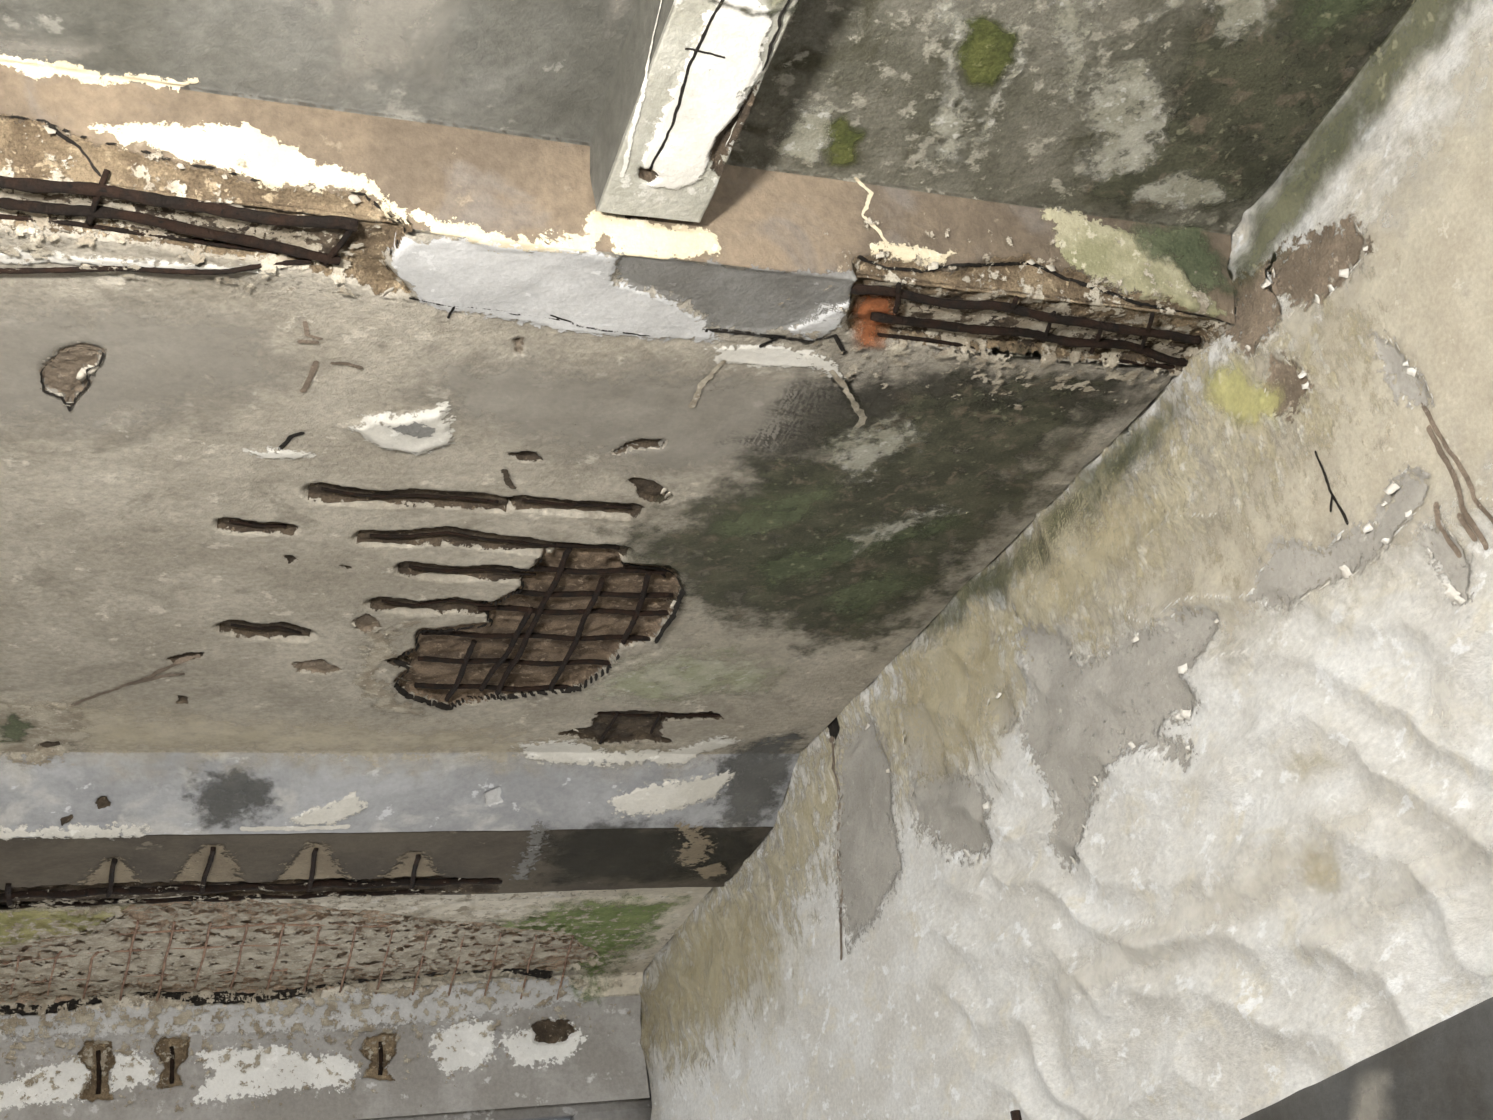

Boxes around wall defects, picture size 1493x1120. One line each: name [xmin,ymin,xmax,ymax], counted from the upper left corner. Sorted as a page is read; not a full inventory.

damp [1053,0,1233,209]
damp [1205,0,1276,40]
spalling [0,113,413,301]
crack [854,177,891,251]
peeling [614,213,1374,427]
spalling [350,531,686,711]
damp [443,51,1493,1084]
damp [184,768,351,832]
damp [59,706,557,765]
spalling [559,710,724,746]
spalling [0,841,691,1120]
damp [1357,1080,1380,1120]